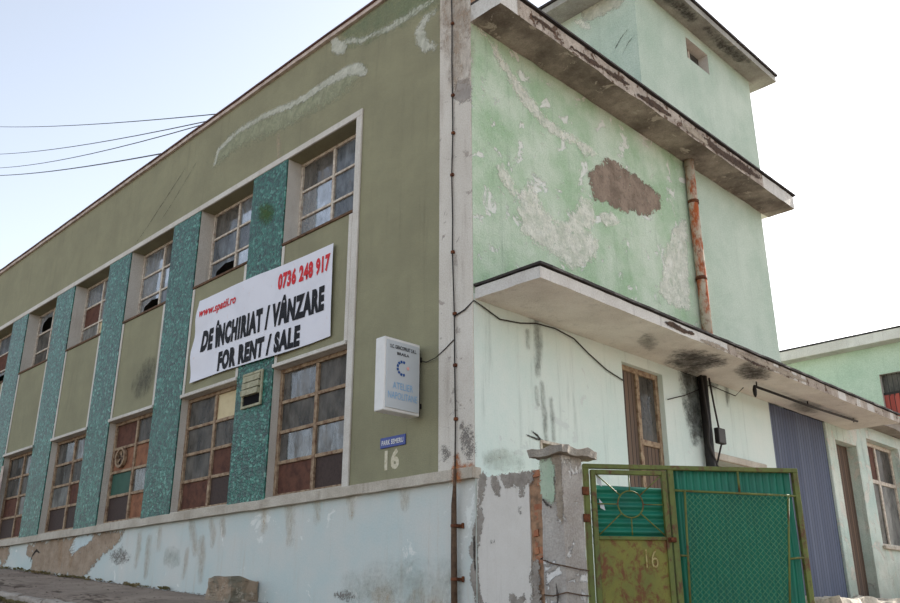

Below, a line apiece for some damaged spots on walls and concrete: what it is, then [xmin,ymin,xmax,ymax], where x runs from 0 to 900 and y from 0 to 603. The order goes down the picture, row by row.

peeling [575,0,624,30]
spalling [637,94,672,117]
peeling [480,28,662,270]
spalling [682,123,761,179]
leakage [667,351,725,443]
leakage [740,364,766,379]
flaking render [26,529,129,579]
spalling [469,454,564,603]